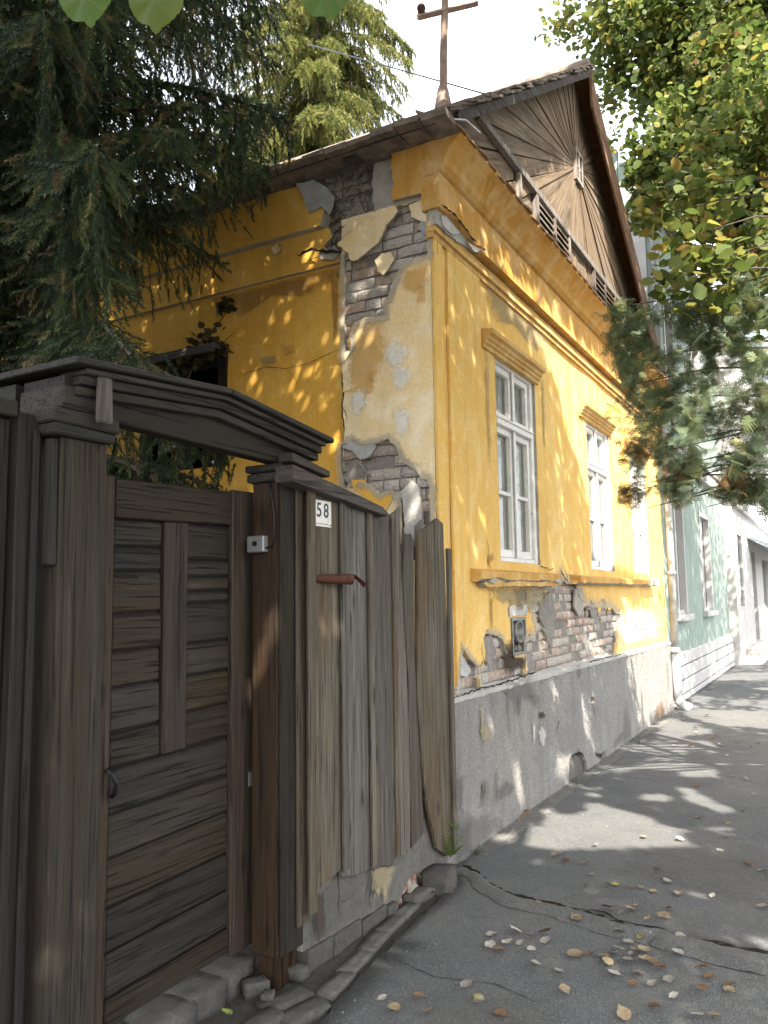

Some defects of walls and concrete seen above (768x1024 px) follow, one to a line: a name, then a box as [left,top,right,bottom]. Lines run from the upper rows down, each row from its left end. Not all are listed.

spalling [296,158,484,392]
spalling [334,434,436,544]
spalling [454,574,657,696]
spalling [569,751,602,781]